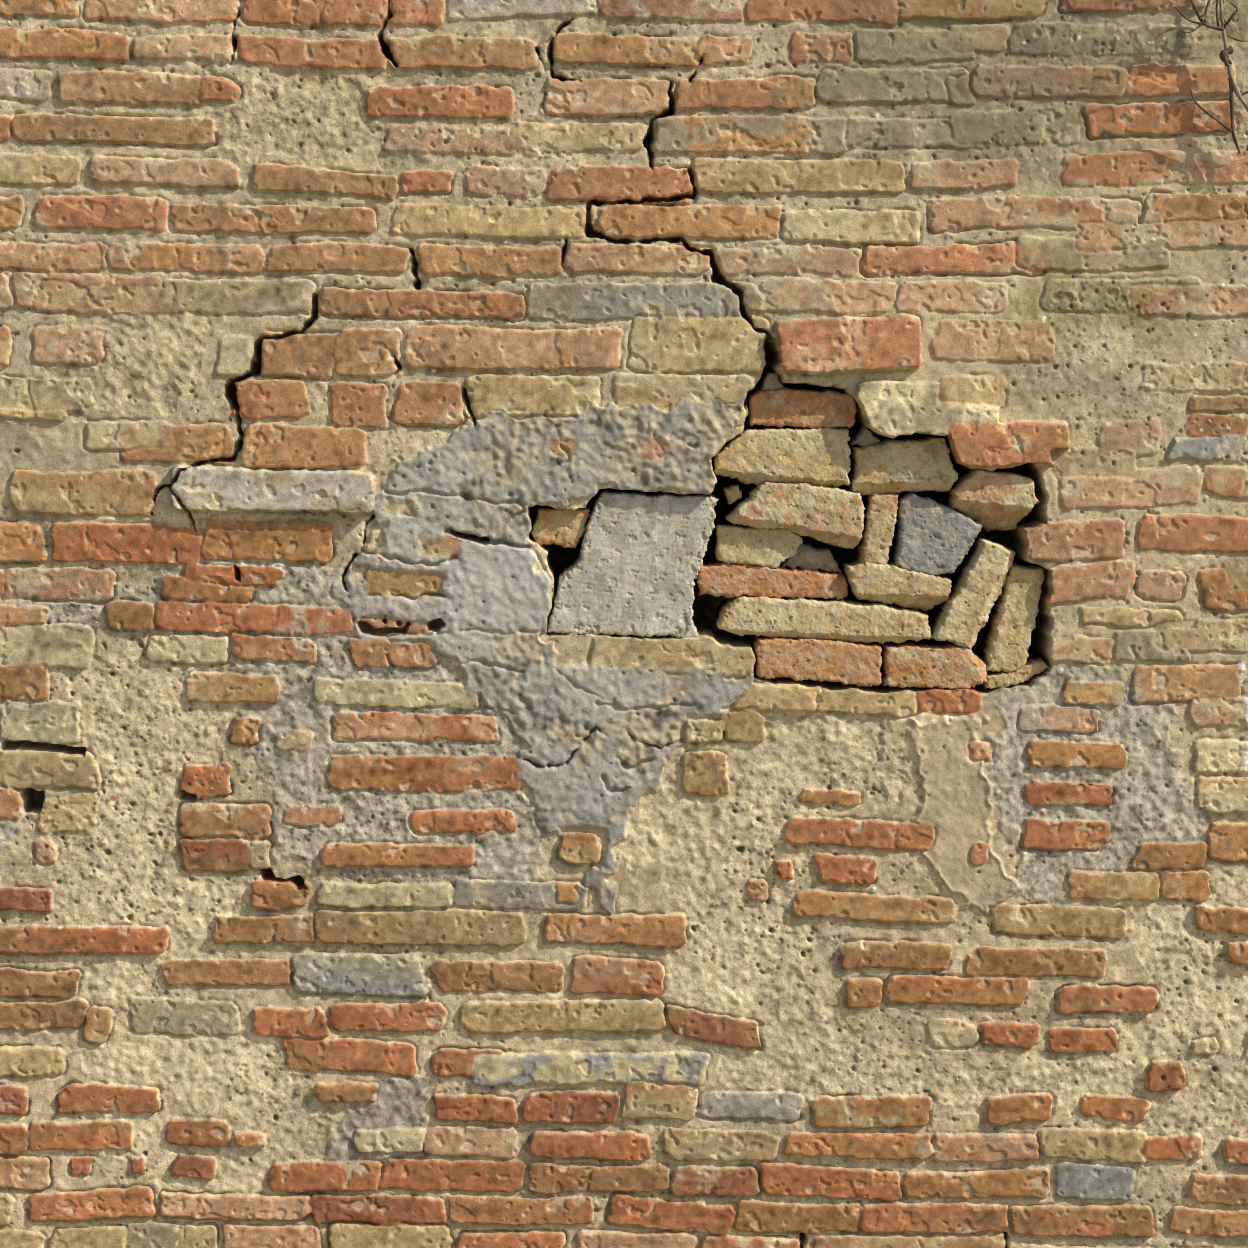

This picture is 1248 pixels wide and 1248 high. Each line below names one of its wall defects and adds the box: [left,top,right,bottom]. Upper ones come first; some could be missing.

crack [377,0,399,68]
crack [534,17,582,83]
crack [409,248,422,291]
crack [560,53,782,427]
crack [149,292,319,531]
crack [461,387,478,427]
spalling [746,366,970,475]
spalling [449,529,490,543]
spalling [528,505,582,602]
spalling [692,580,755,655]
spalling [702,475,754,561]
spalling [754,463,1053,695]